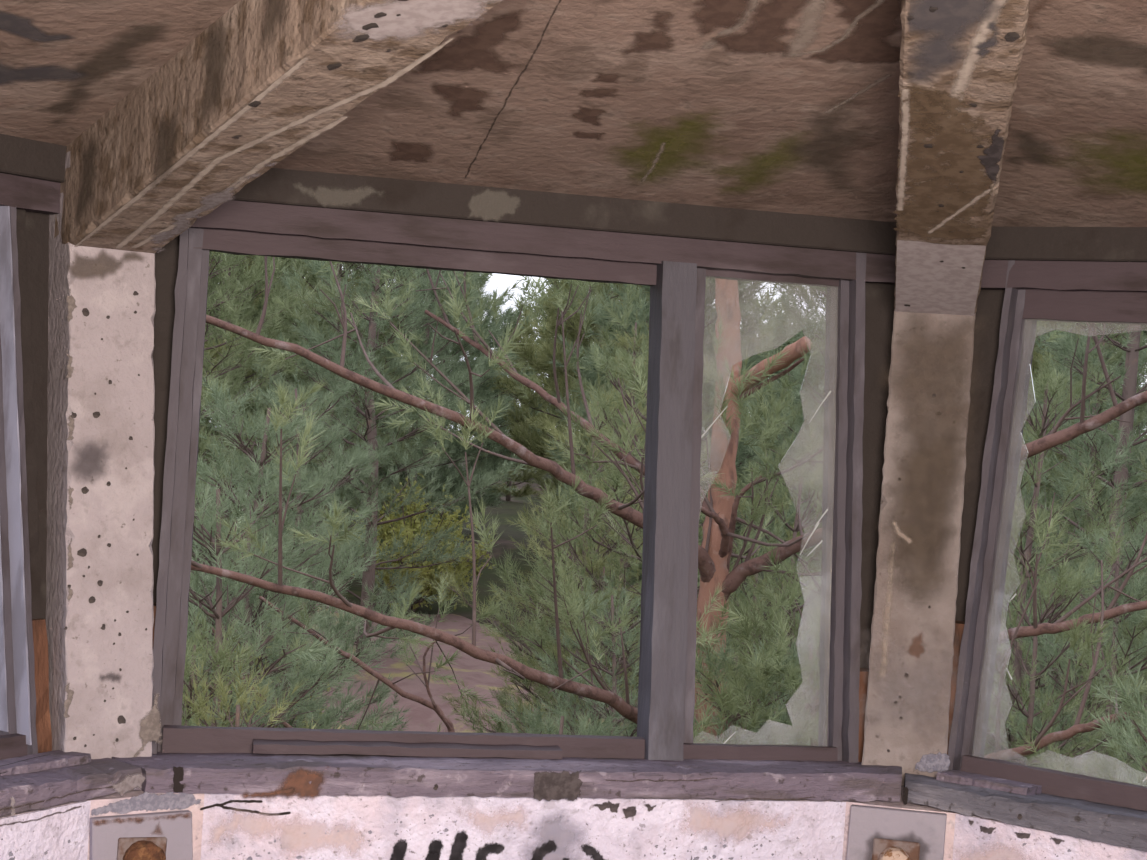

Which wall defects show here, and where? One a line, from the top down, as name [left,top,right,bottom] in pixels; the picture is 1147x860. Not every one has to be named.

leakage [0,12,71,42]
leakage [626,13,673,53]
leakage [0,27,160,112]
crack [465,0,561,178]
leakage [573,74,618,139]
corrosion [244,769,323,798]
crack [200,800,291,816]